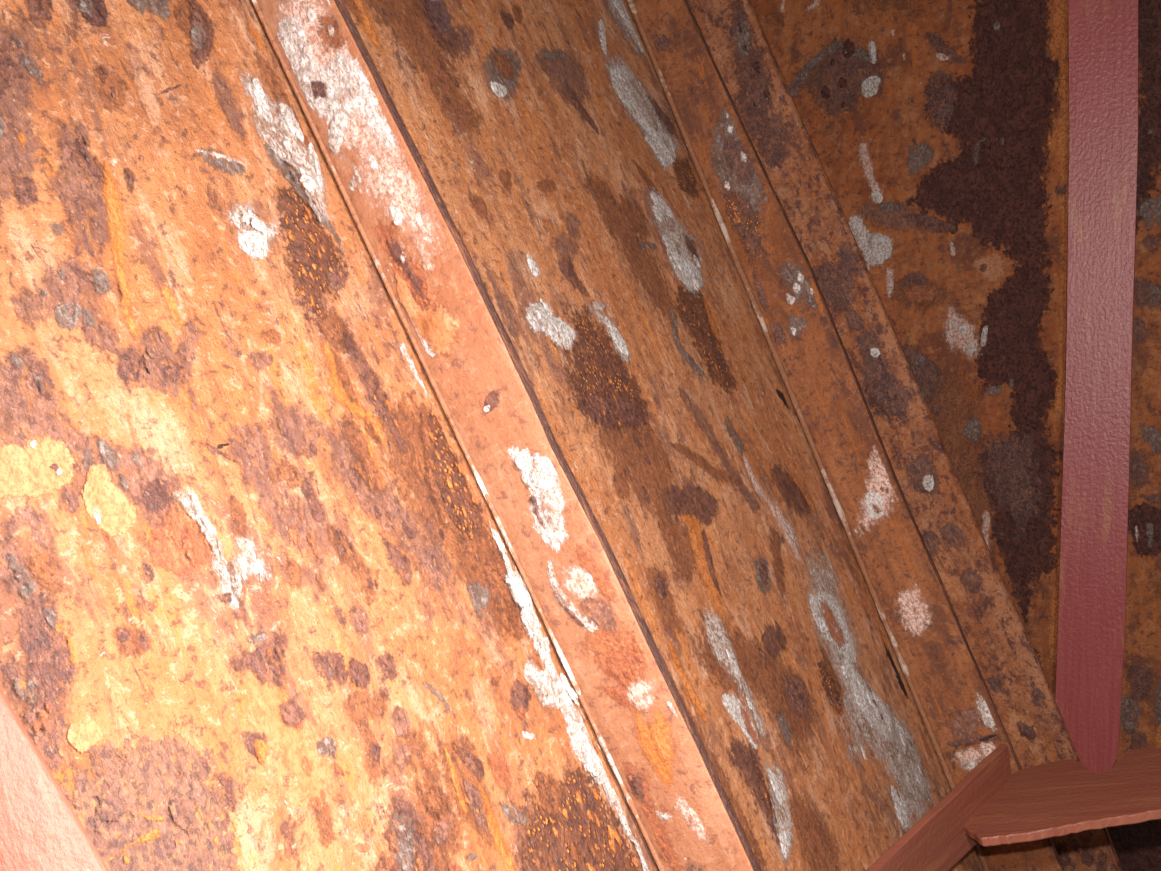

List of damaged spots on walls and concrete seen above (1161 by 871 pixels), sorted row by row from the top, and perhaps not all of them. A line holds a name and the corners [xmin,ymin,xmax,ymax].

rust [0,0,204,414]
rust [0,346,212,583]
rust [0,507,254,871]
damp [240,72,330,227]
damp [277,0,440,262]
rust [225,186,534,645]
damp [400,343,426,393]
rust [313,0,816,871]
damp [481,500,649,871]
damp [760,489,935,831]
damp [855,445,899,534]
rust [684,0,1079,770]